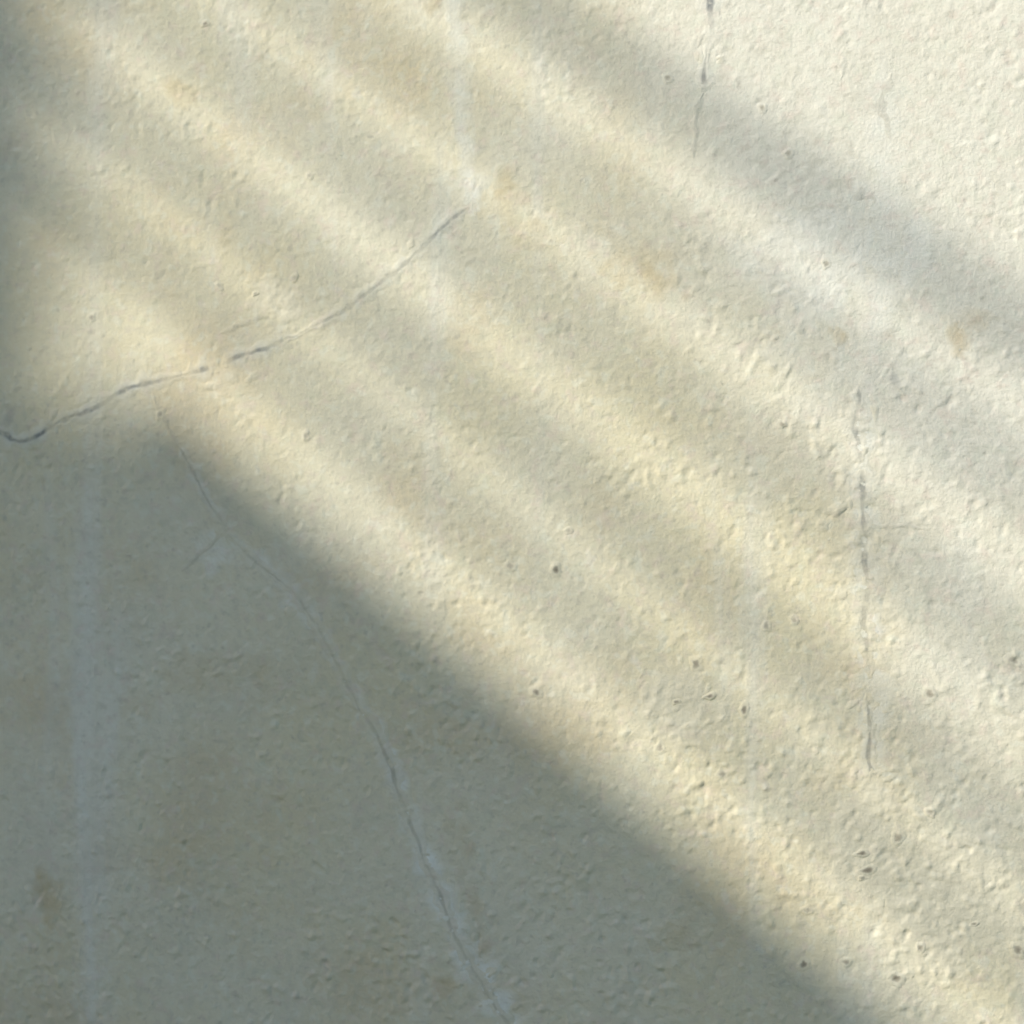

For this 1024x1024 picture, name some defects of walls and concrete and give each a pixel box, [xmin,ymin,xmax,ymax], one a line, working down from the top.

crack [688,0,726,158]
crack [0,205,470,450]
crack [814,368,924,826]